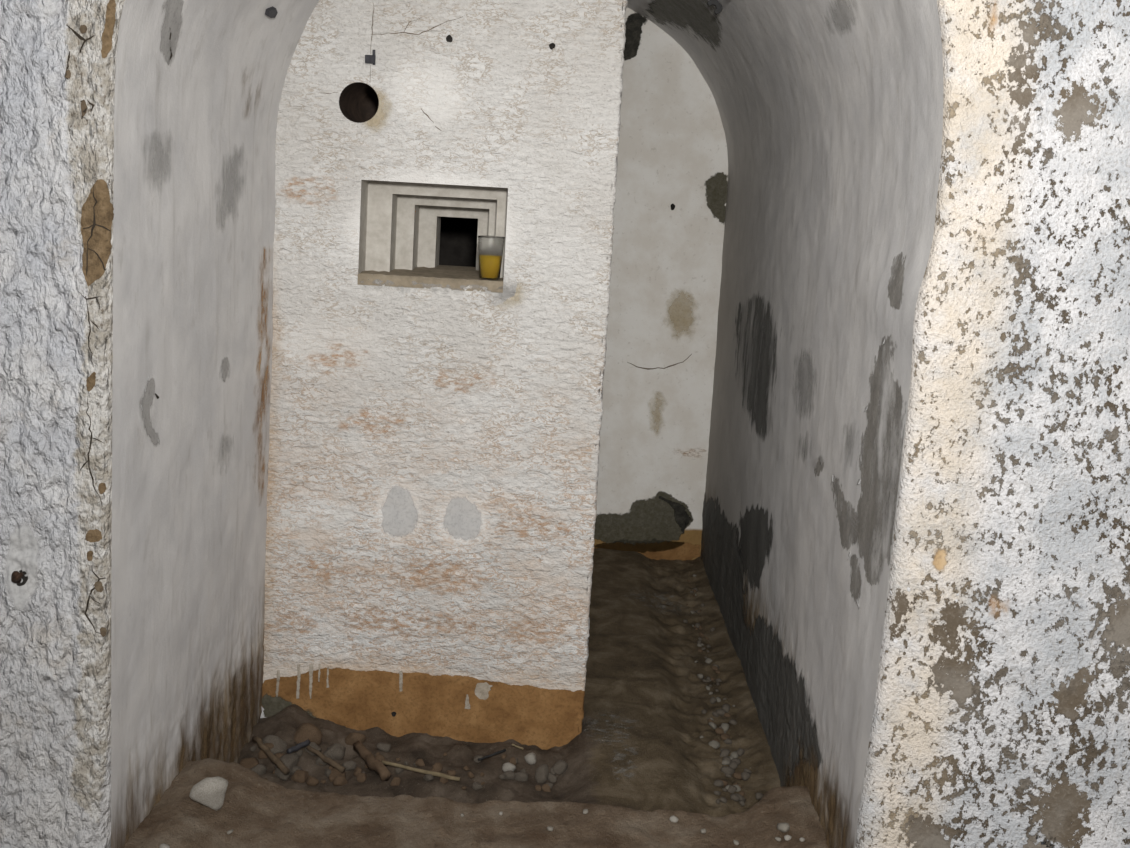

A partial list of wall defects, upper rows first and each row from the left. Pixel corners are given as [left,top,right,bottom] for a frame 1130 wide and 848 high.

peeling [1000,13,1107,165]
flaking render [81,179,114,286]
peeling [705,172,728,223]
leakage [735,296,777,439]
leakage [177,677,316,773]
peeling [926,589,980,712]
peeling [1049,659,1101,720]
peeling [1098,575,1130,662]
peeling [900,808,959,848]
peeling [1022,774,1098,848]